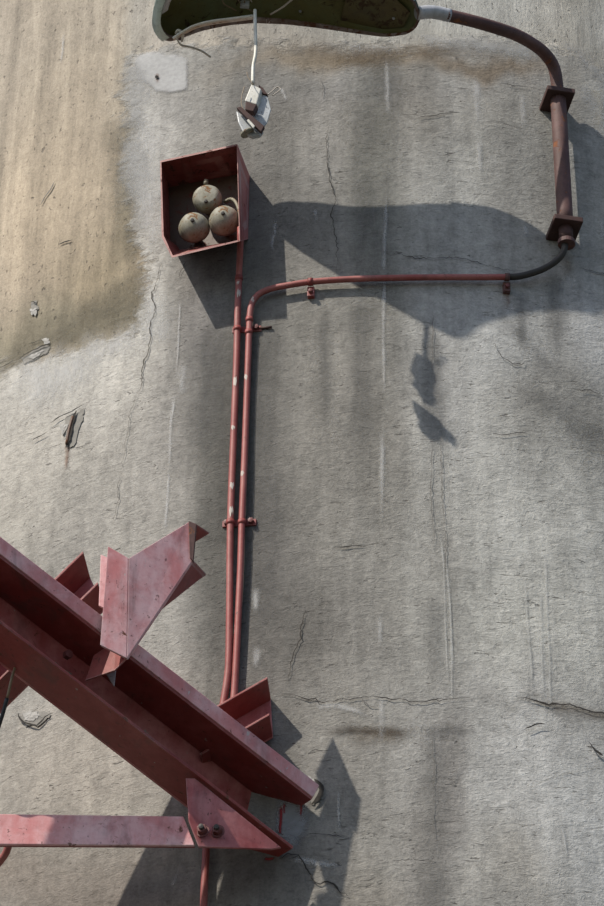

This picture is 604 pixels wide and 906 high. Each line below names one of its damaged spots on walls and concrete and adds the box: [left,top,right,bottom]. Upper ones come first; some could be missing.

crack [321,125,338,272]
spalling [50,404,84,462]
crack [113,262,186,520]
crack [282,611,468,706]
crack [282,853,347,895]